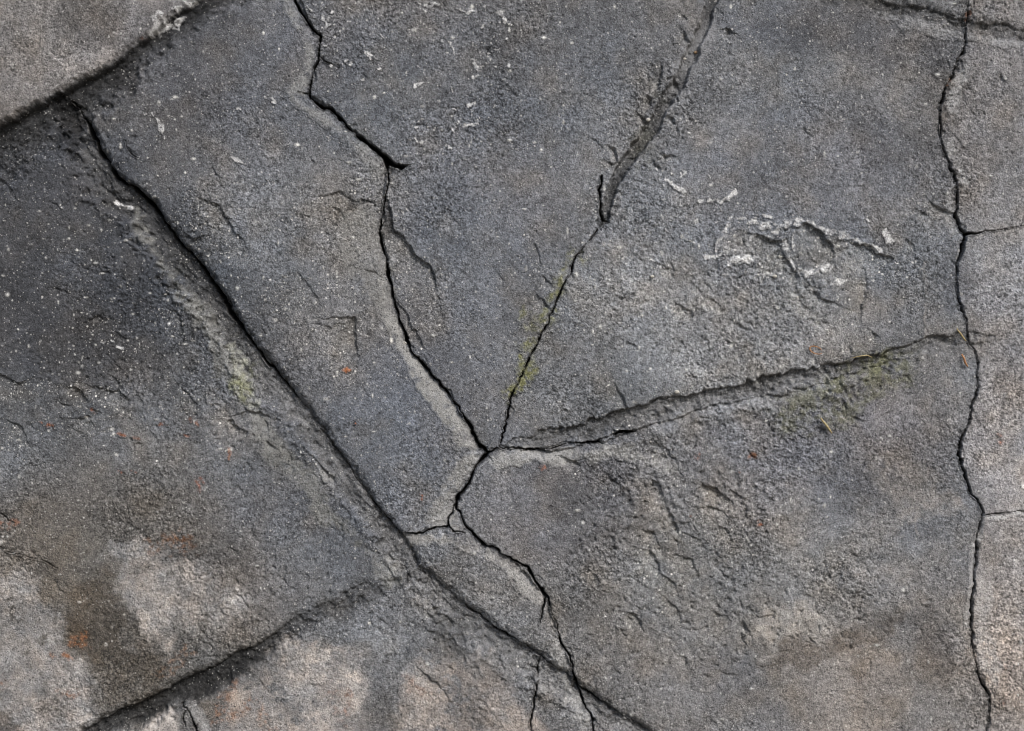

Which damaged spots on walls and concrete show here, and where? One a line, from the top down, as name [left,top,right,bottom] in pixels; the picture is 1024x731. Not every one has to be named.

crack [70,100,298,397]
crack [280,0,646,731]
crack [939,0,1024,731]
crack [0,546,58,569]
crack [181,701,198,731]